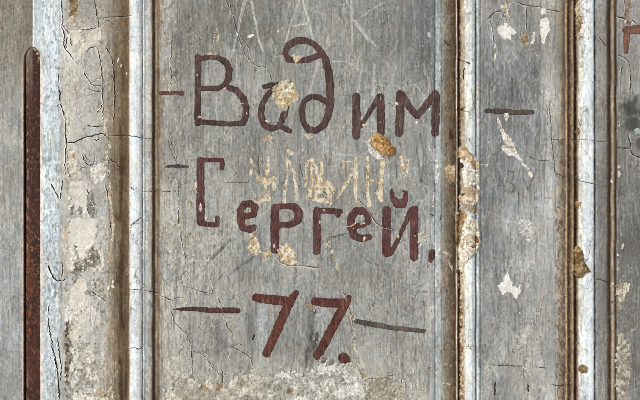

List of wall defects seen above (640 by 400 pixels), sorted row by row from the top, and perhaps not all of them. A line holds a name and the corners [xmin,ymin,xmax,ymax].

peeling [497,1,551,48]
crack [50,0,152,218]
flaking render [271,78,300,113]
peeling [364,138,384,160]
peeling [497,113,533,177]
flaking render [431,146,488,247]
crack [47,262,66,283]
crack [131,182,255,383]
crack [276,258,322,269]
peeling [497,273,521,303]
crack [46,304,62,400]
flaking render [162,309,407,400]